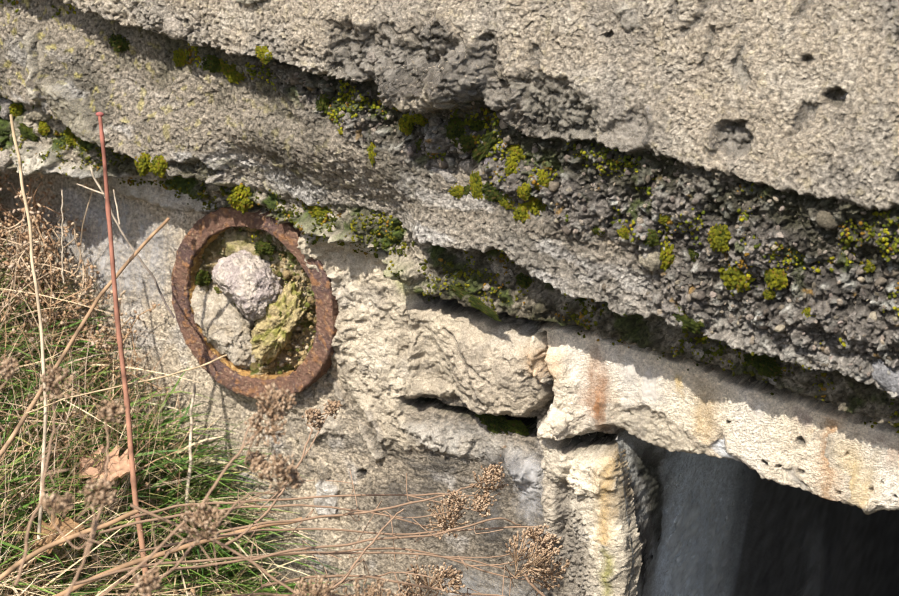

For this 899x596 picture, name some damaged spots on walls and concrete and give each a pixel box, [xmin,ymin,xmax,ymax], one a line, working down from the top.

rust [591,375,606,428]